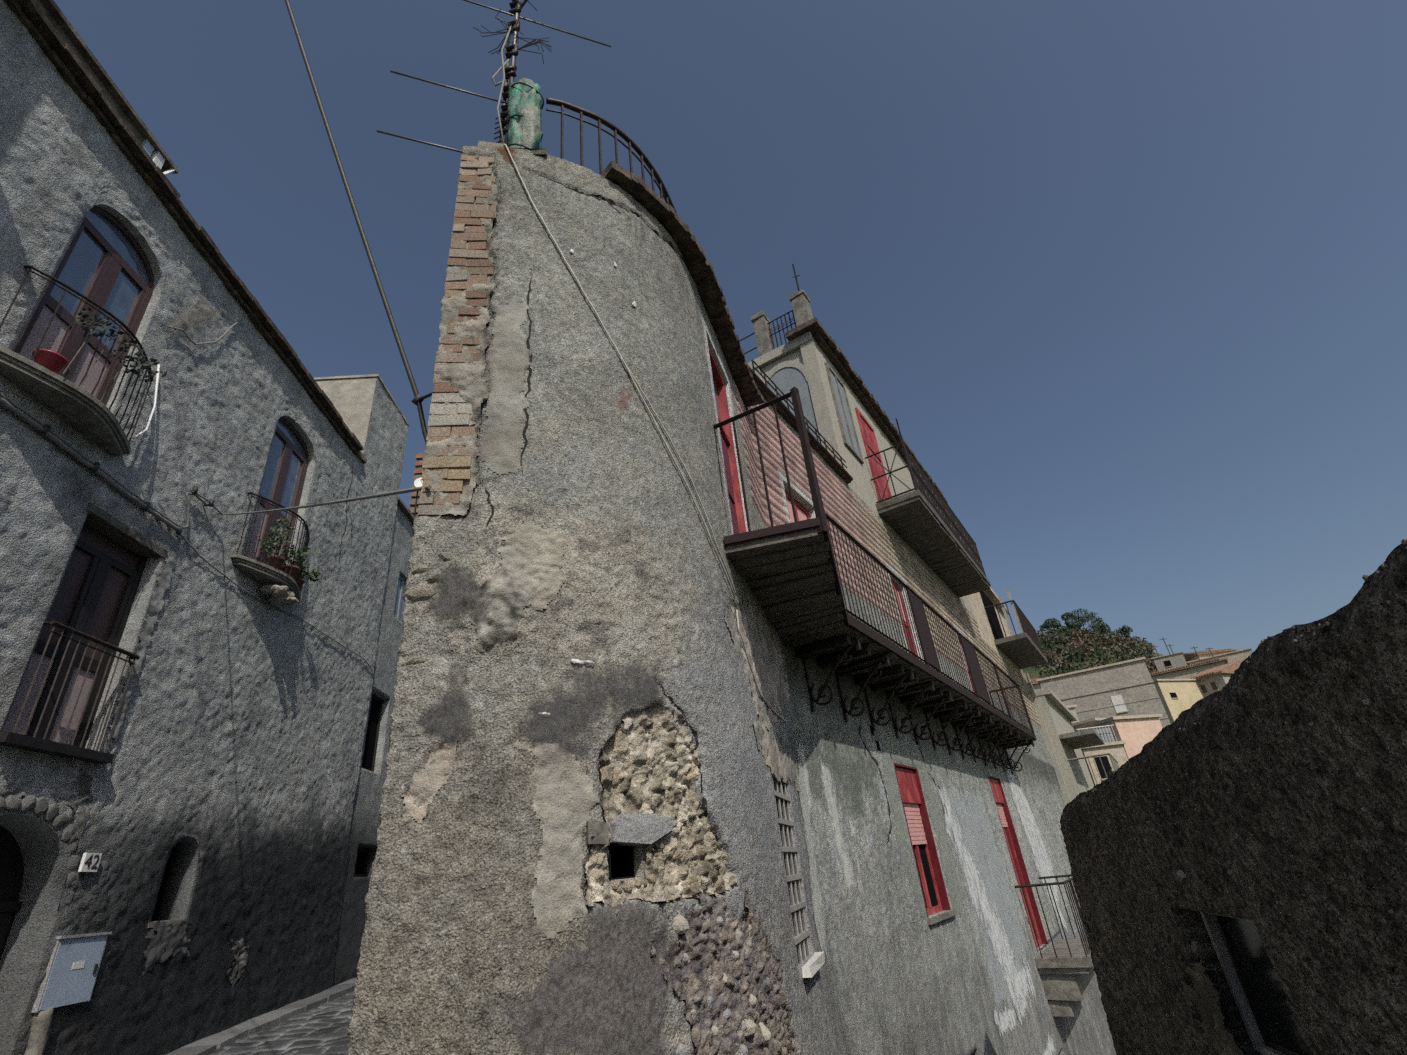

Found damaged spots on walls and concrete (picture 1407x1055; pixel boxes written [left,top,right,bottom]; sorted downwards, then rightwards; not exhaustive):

spalling [417,154,499,516]
crack [520,269,533,474]
leakage [430,563,485,617]
leakage [420,668,472,743]
leakage [518,658,664,753]
spalling [584,704,739,907]
leakage [507,902,675,1055]